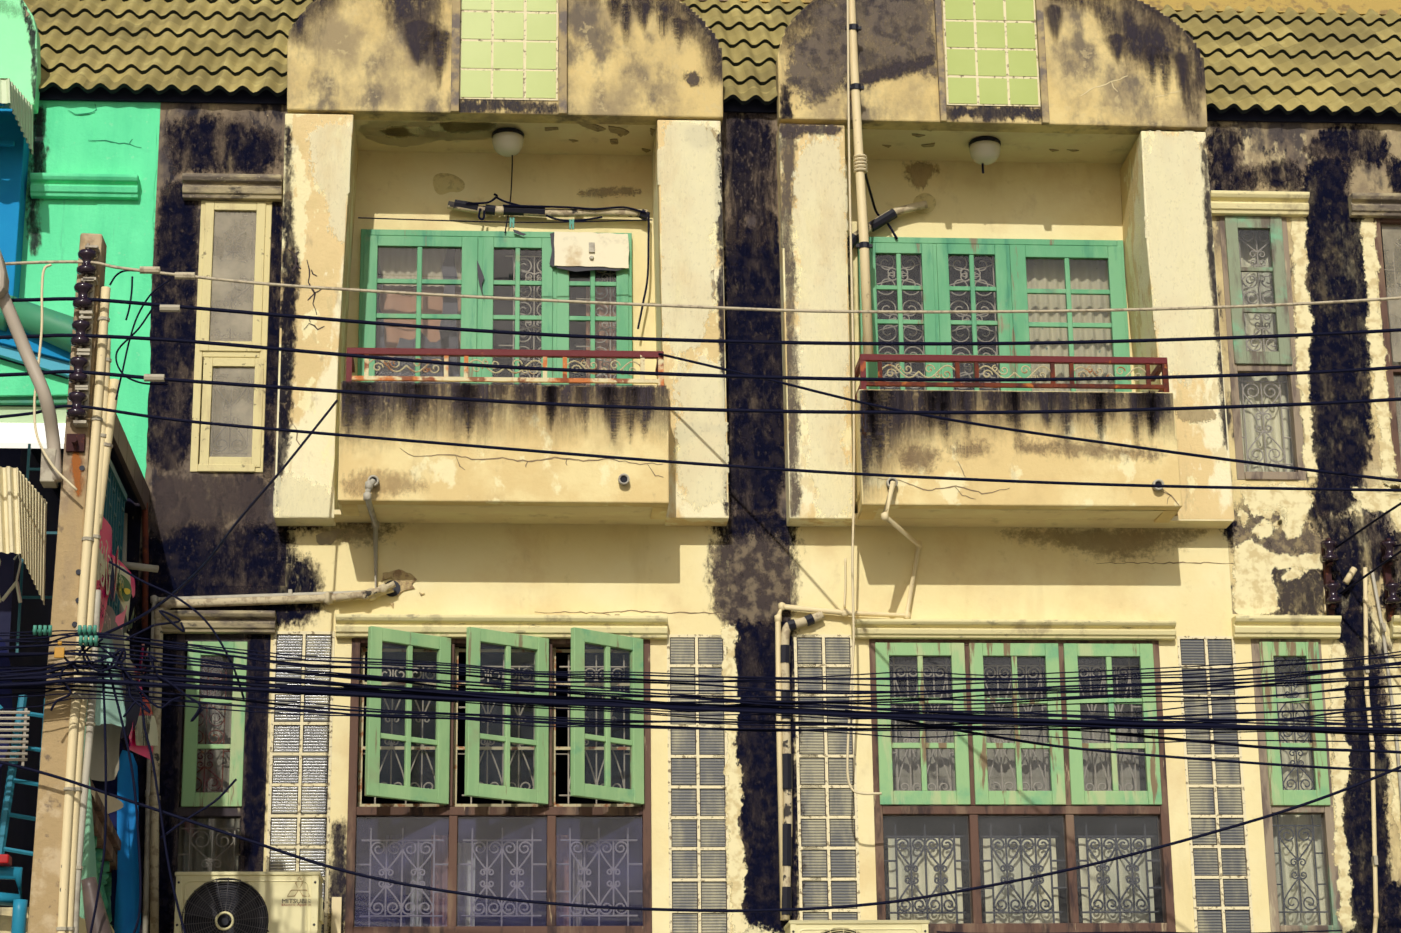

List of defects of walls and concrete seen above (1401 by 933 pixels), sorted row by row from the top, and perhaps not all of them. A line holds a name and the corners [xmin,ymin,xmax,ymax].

leakage [290,0,338,38]
leakage [385,0,449,77]
leakage [610,0,722,86]
leakage [946,105,1041,122]
leakage [340,381,670,437]
leakage [707,0,939,933]
leakage [859,390,1173,483]
leakage [124,110,390,933]
leakage [1201,124,1401,933]